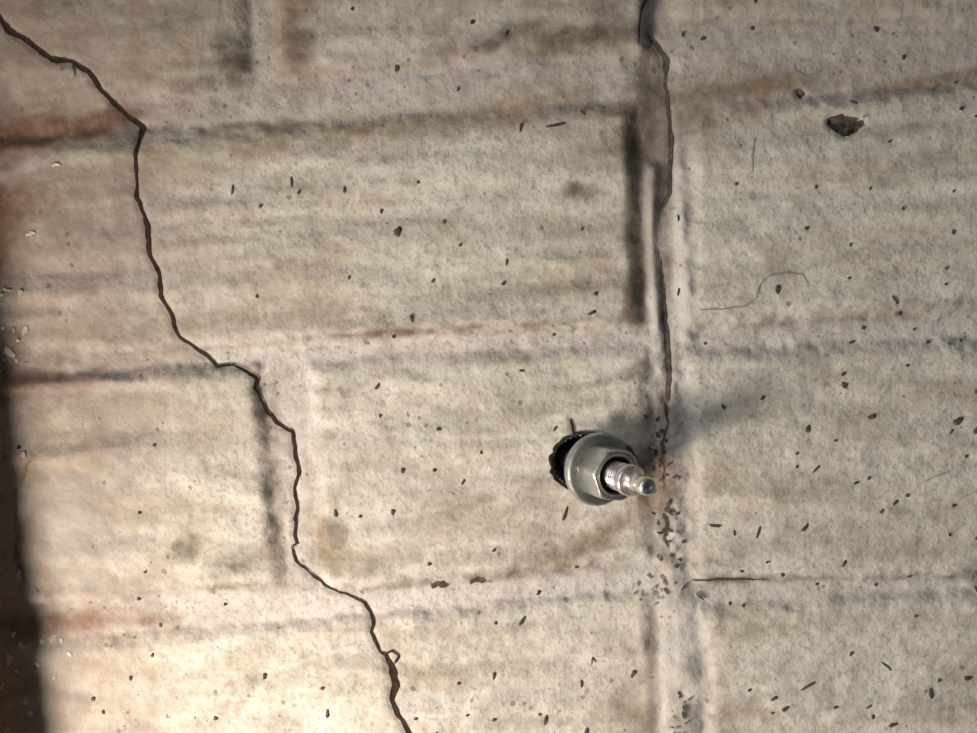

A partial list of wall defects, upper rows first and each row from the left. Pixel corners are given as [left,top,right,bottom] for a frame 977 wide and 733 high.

crack [638,0,673,208]
crack [0,17,410,733]
crack [658,253,671,490]
crack [662,513,670,549]